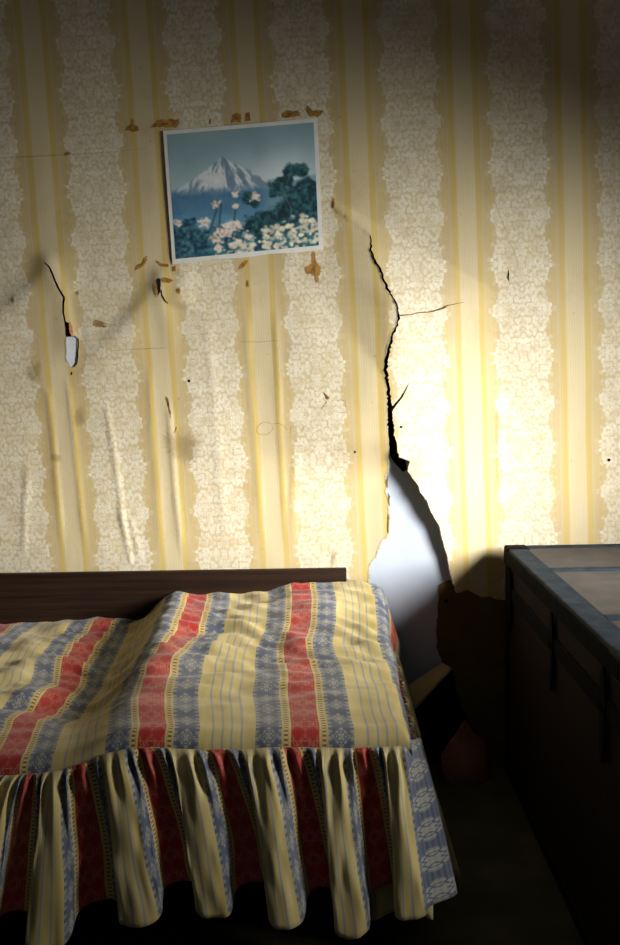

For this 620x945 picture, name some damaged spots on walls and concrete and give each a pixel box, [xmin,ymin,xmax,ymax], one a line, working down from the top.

crack [44,262,65,319]
crack [370,235,463,472]